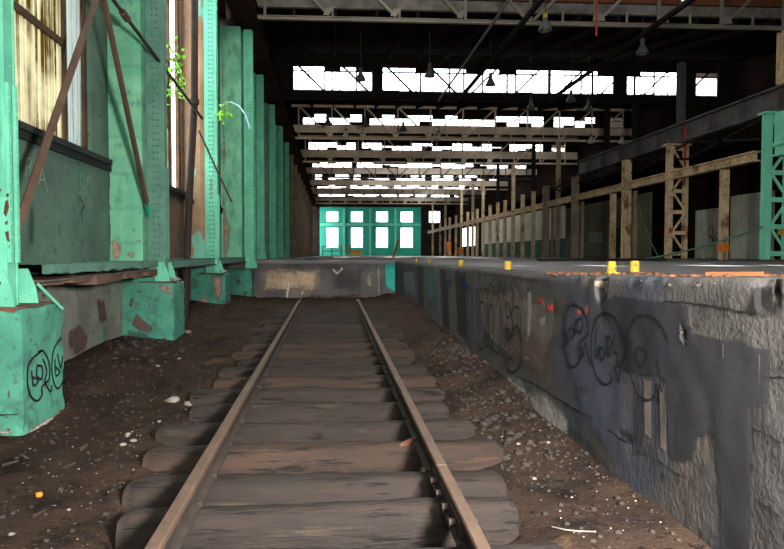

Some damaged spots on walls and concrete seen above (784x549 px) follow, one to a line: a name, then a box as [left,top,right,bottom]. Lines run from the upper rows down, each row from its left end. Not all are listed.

peeling [112,241,134,259]
peeling [200,277,221,303]
peeling [130,298,152,333]